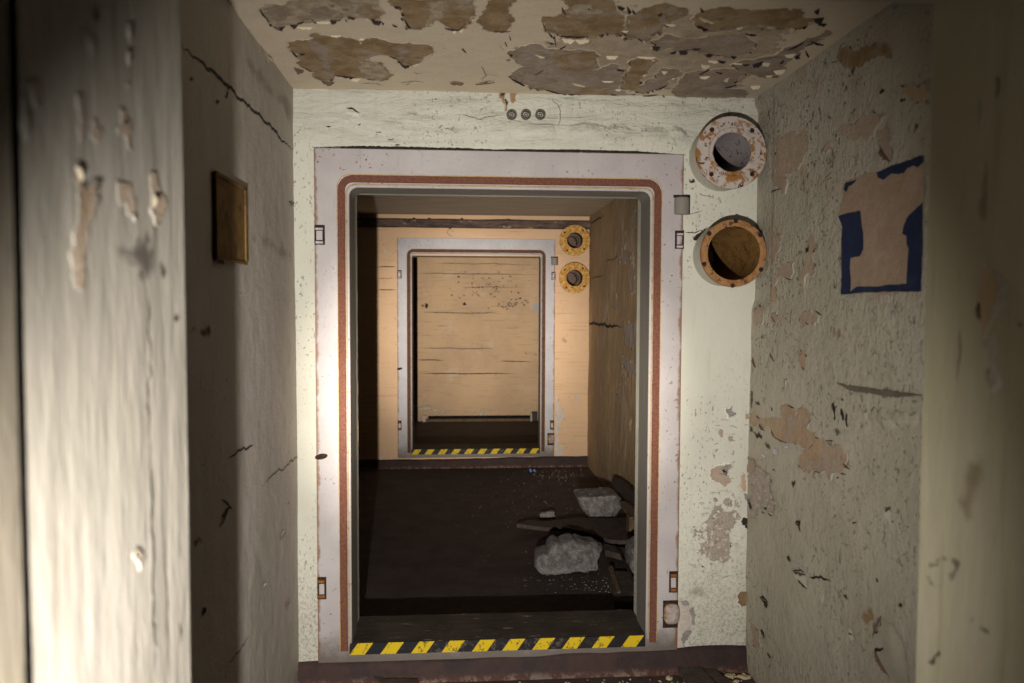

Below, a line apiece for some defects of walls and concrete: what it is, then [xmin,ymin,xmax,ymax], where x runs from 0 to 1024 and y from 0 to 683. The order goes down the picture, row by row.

crack [180,36,294,149]
peeling [257,0,833,100]
peeling [831,41,893,74]
peeling [68,161,101,292]
peeling [116,171,167,228]
corrosion [337,174,663,319]
crack [589,320,621,328]
crack [264,457,297,485]
flaking render [688,451,776,579]
peeling [724,376,850,488]
crack [836,382,923,398]